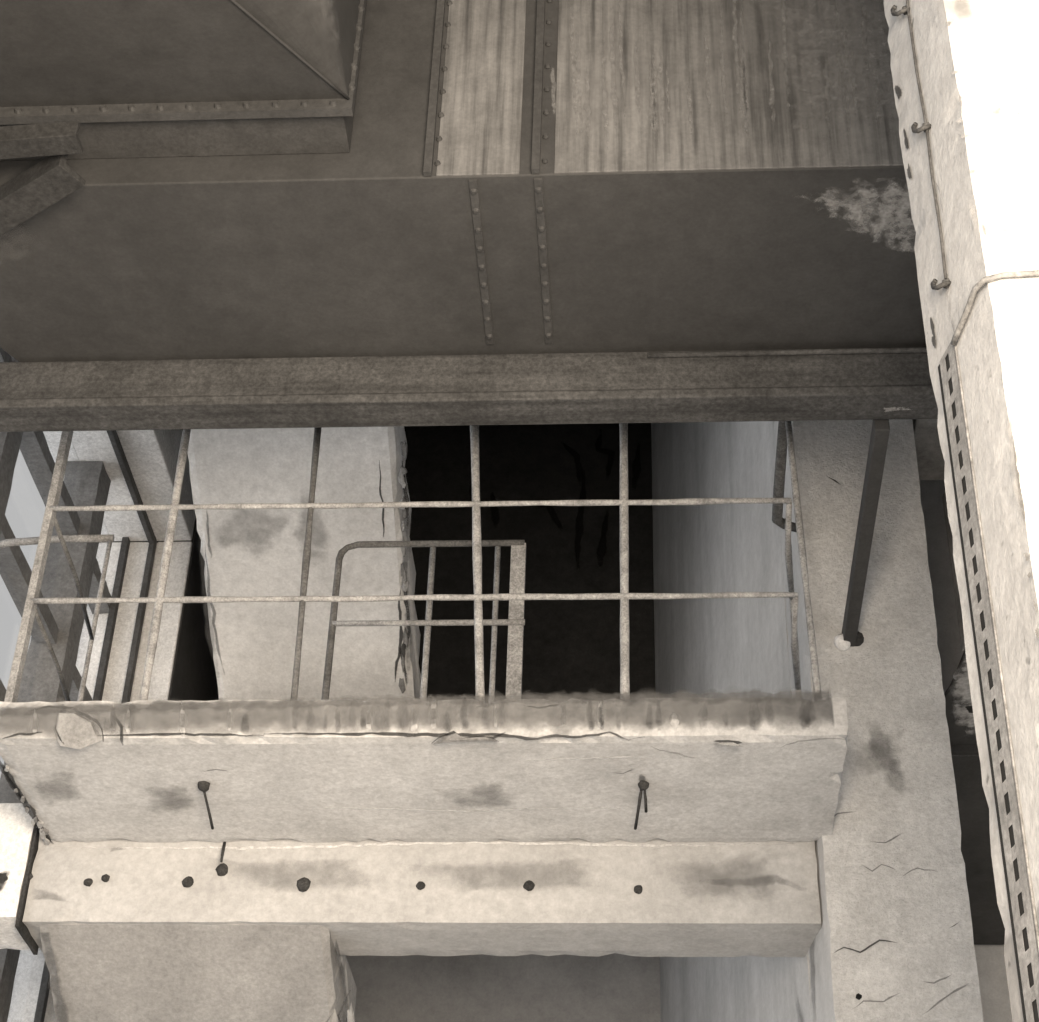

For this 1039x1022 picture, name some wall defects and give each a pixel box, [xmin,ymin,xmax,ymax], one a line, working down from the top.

spalling [395,441,411,694]
peeling [953,660,975,733]
water stain [136,841,709,850]
spalling [326,943,355,1022]